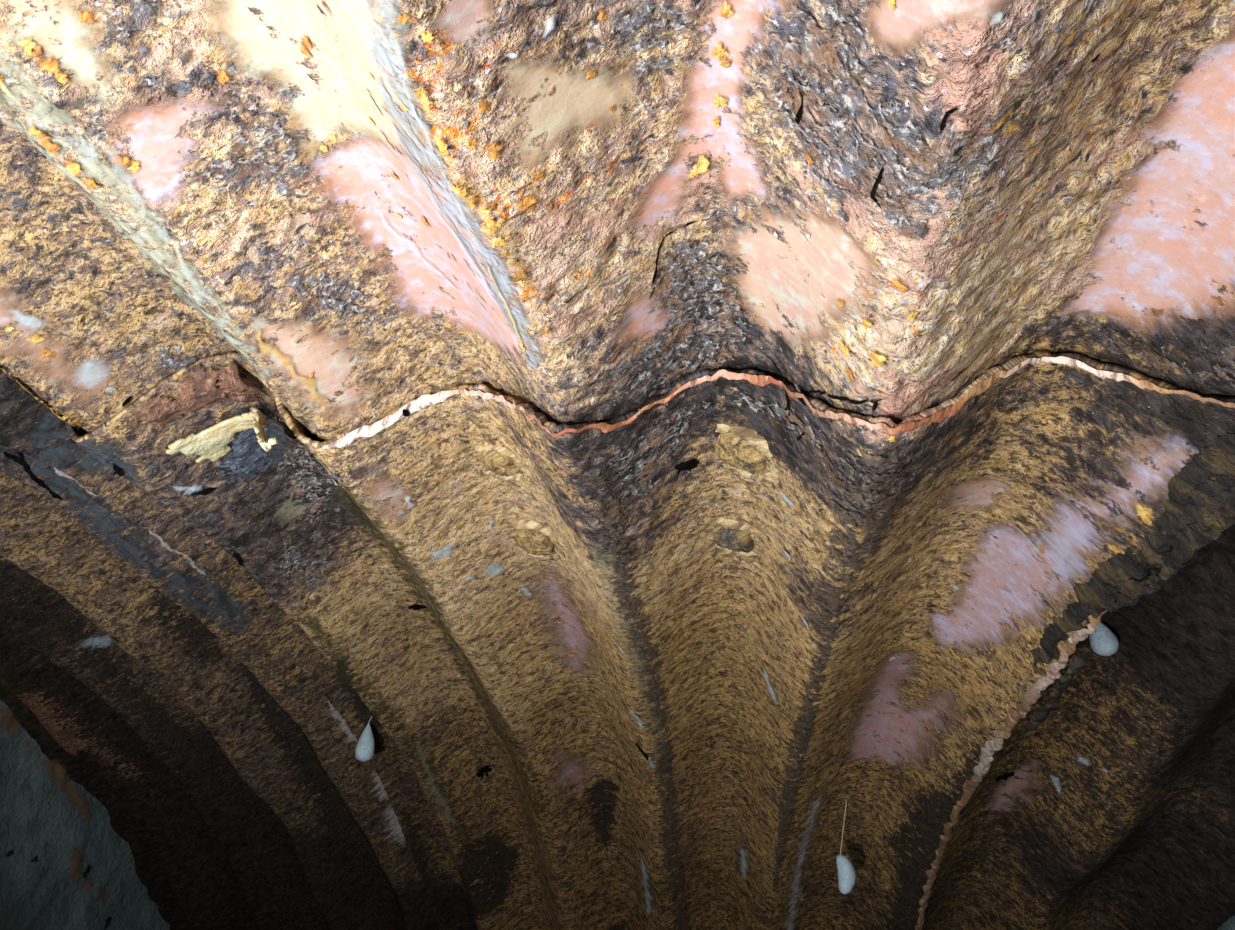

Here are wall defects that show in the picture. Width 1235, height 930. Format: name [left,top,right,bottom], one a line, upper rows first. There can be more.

corrosion [388,5,410,50]
corrosion [399,71,433,120]
corrosion [477,99,491,113]
leakage [367,0,540,369]
corrosion [434,135,552,353]
peeling [165,405,278,463]
crack [768,356,884,473]